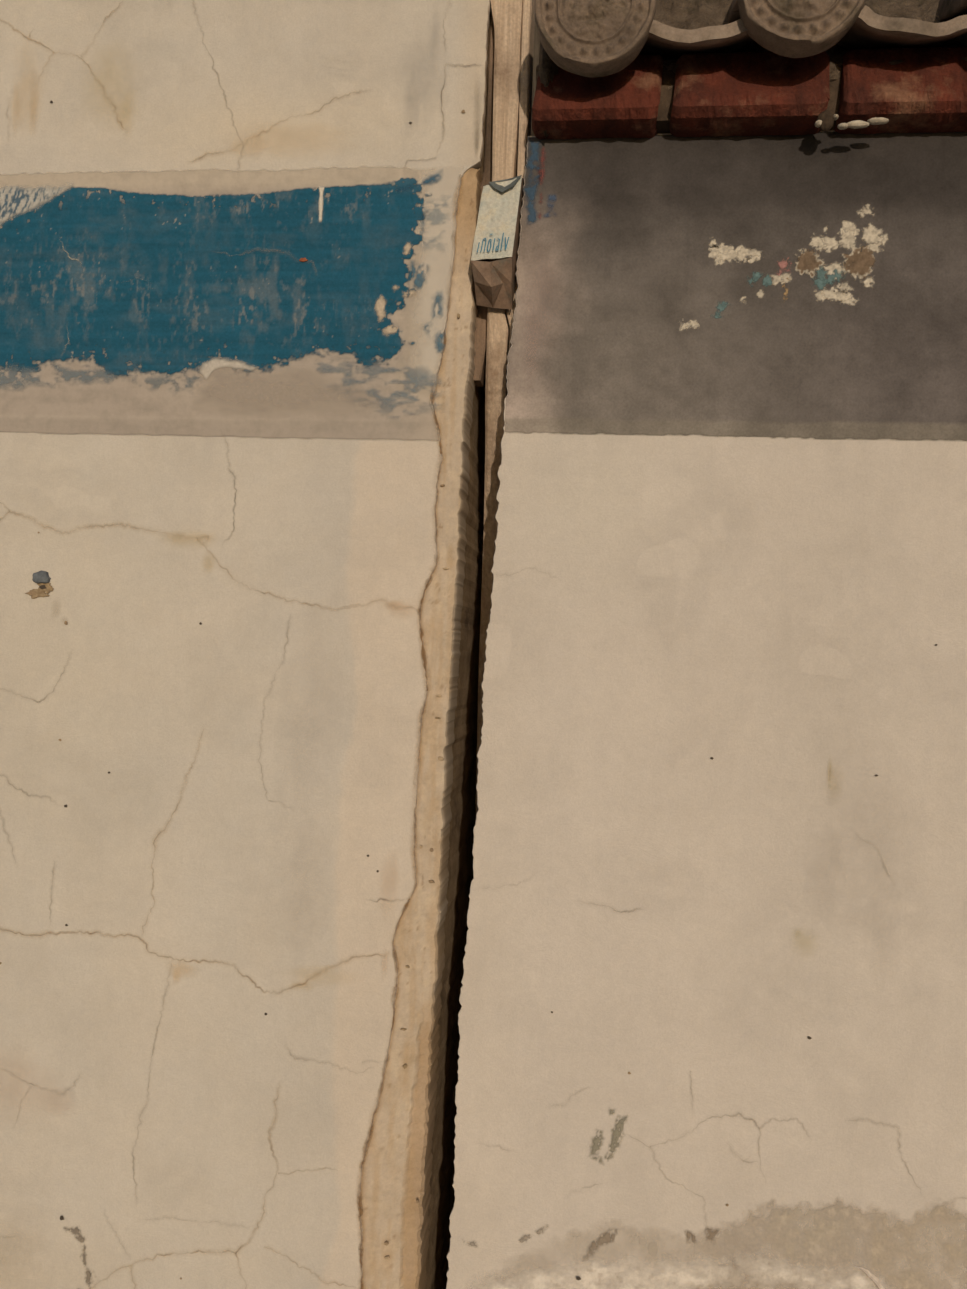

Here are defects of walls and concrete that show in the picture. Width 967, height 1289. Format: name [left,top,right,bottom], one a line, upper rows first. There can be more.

peeling [708,204,888,318]
peeling [0,168,482,1289]
water stain [695,1202,967,1289]